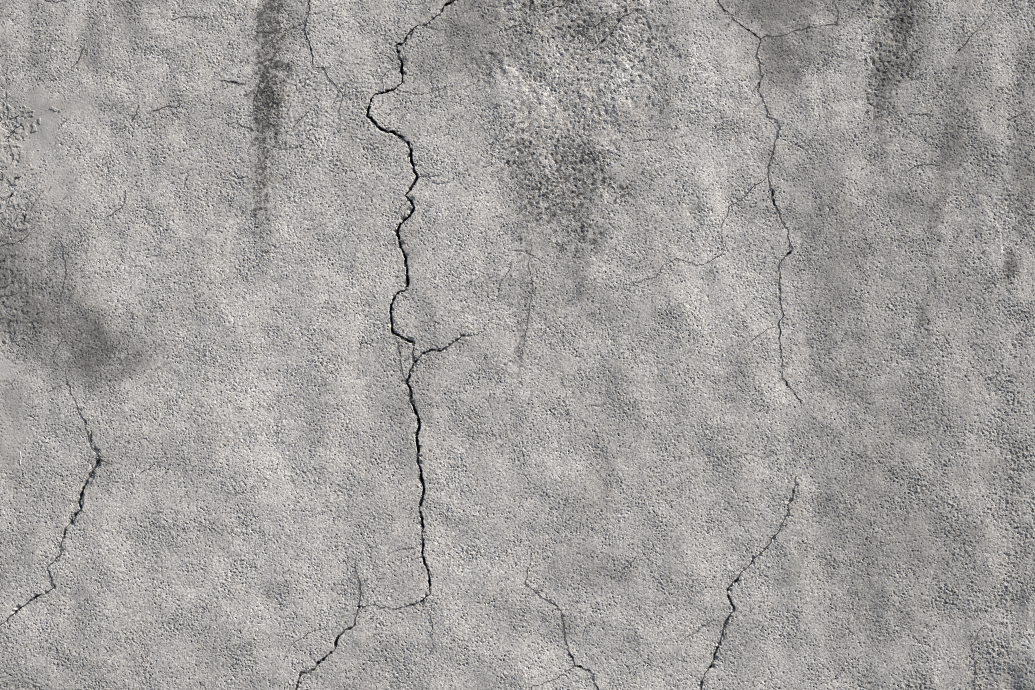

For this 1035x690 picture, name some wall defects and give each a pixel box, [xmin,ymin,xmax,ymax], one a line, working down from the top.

water stain [241,0,292,226]
crack [640,0,840,403]
crack [0,244,113,626]
crack [284,0,479,690]
crack [525,548,599,690]
crack [700,476,797,690]
crack [971,627,983,690]